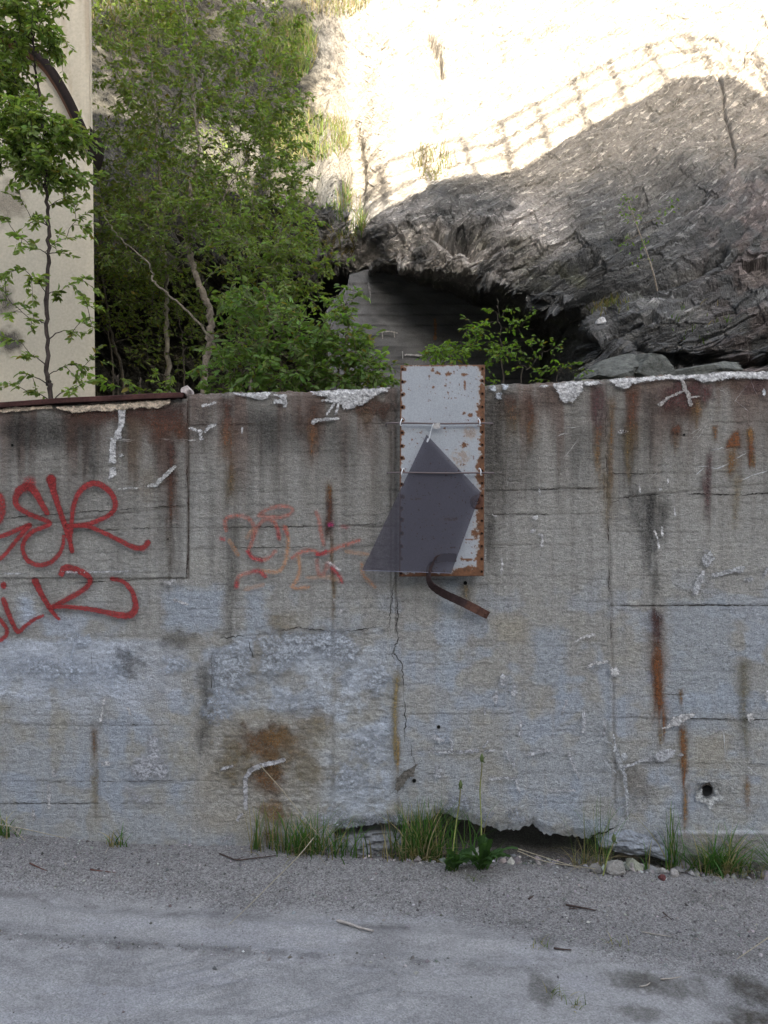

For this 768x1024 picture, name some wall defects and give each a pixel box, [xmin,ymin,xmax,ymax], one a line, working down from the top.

leakage [0,399,171,468]
corrosion [703,454,712,513]
corrosion [713,426,755,514]
crack [211,584,415,762]
corrosion [651,608,666,742]
corrosion [223,723,314,840]
peeling [597,718,737,818]
corrosion [680,728,688,823]